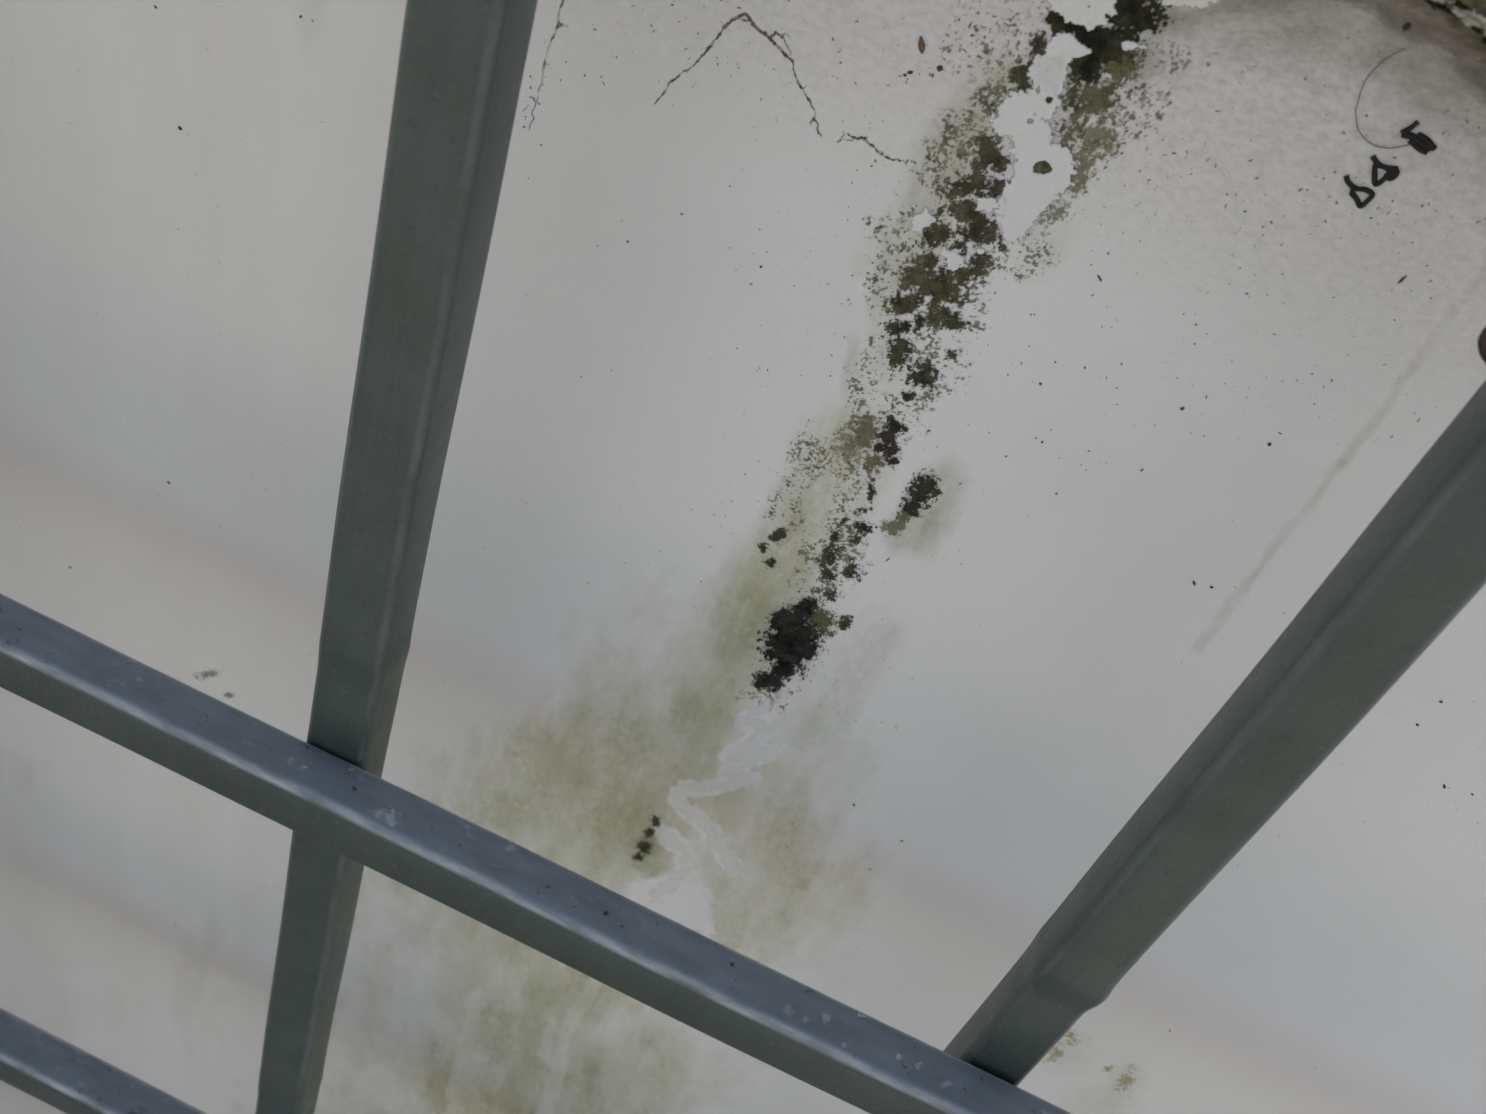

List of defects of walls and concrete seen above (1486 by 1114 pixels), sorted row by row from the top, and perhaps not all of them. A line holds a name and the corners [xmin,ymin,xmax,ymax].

crack [529,0,564,129]
crack [655,12,904,162]
water stain [1359,0,1486,103]
peeling [1432,0,1486,36]
water stain [757,0,1172,635]
water stain [632,815,660,861]